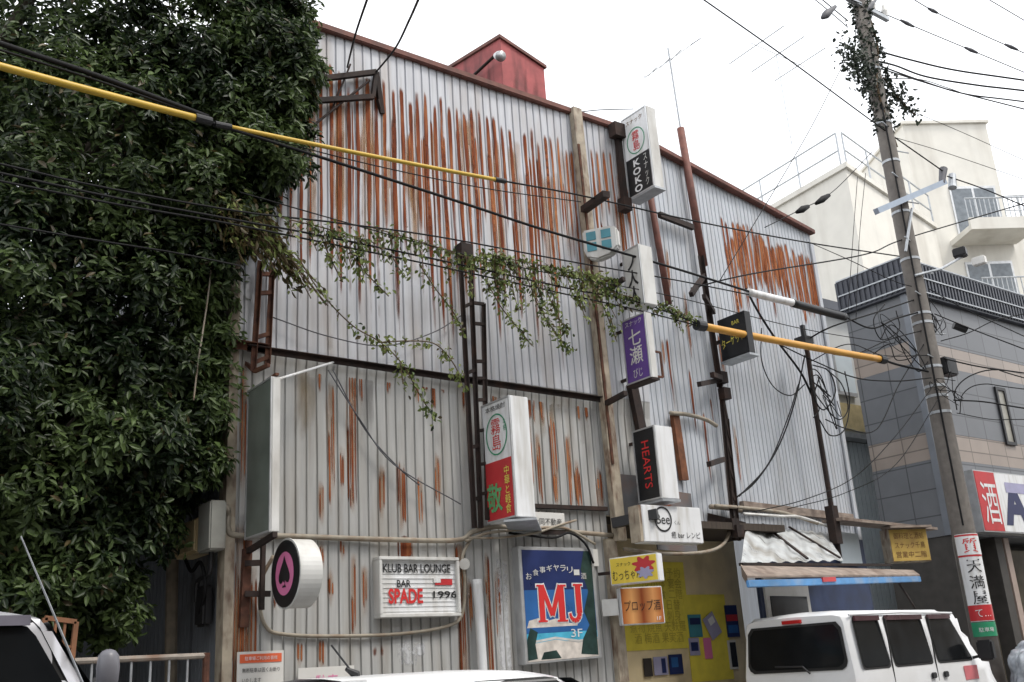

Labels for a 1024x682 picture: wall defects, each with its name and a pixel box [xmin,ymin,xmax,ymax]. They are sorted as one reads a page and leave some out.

corrosion [279,65,582,336]
corrosion [721,218,819,322]
corrosion [319,374,363,515]
corrosion [379,463,423,522]
corrosion [528,400,582,505]
corrosion [397,536,412,557]
corrosion [351,565,367,633]
corrosion [458,573,473,670]
corrosion [486,558,501,670]